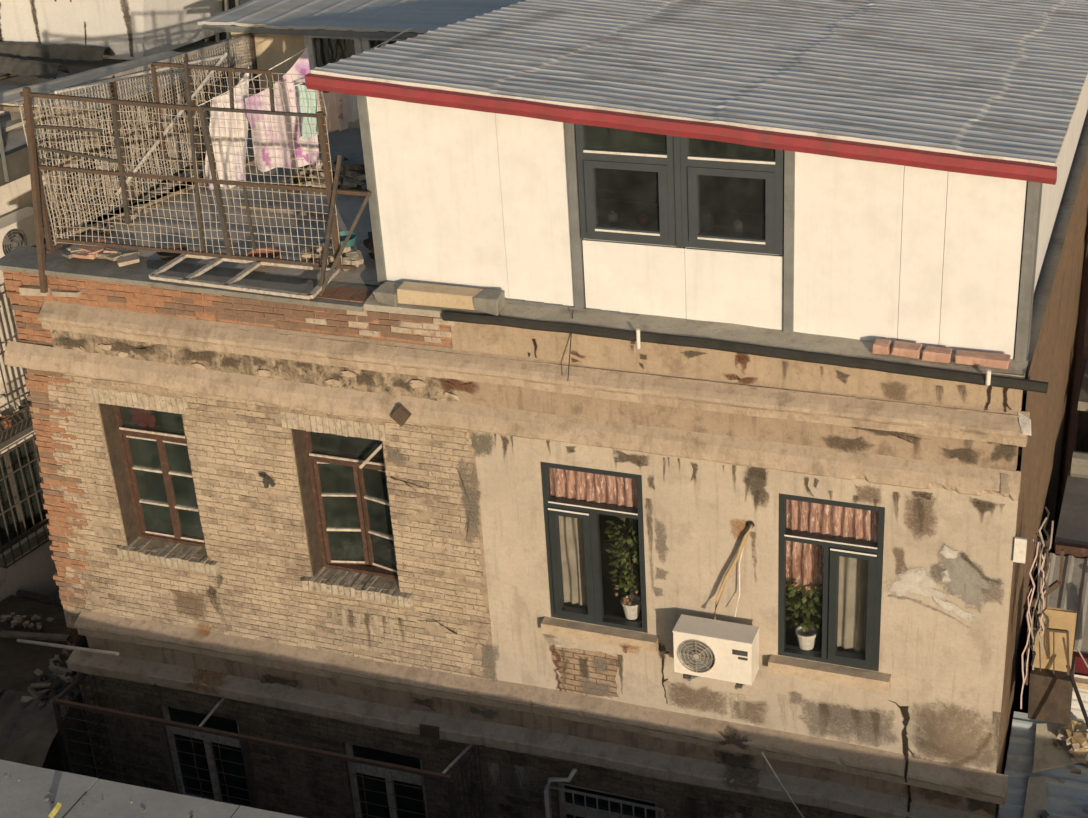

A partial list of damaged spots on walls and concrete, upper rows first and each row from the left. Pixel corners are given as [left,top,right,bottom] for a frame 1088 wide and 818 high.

flaking render [25,368,91,607]
leakage [458,433,513,541]
leakage [723,465,769,506]
leakage [854,486,879,507]
leakage [893,491,934,534]
leakage [973,499,996,517]
spalling [888,545,1004,620]
leakage [482,646,498,679]
flaking render [546,638,623,697]
crack [888,700,914,818]
leakage [915,705,1002,766]